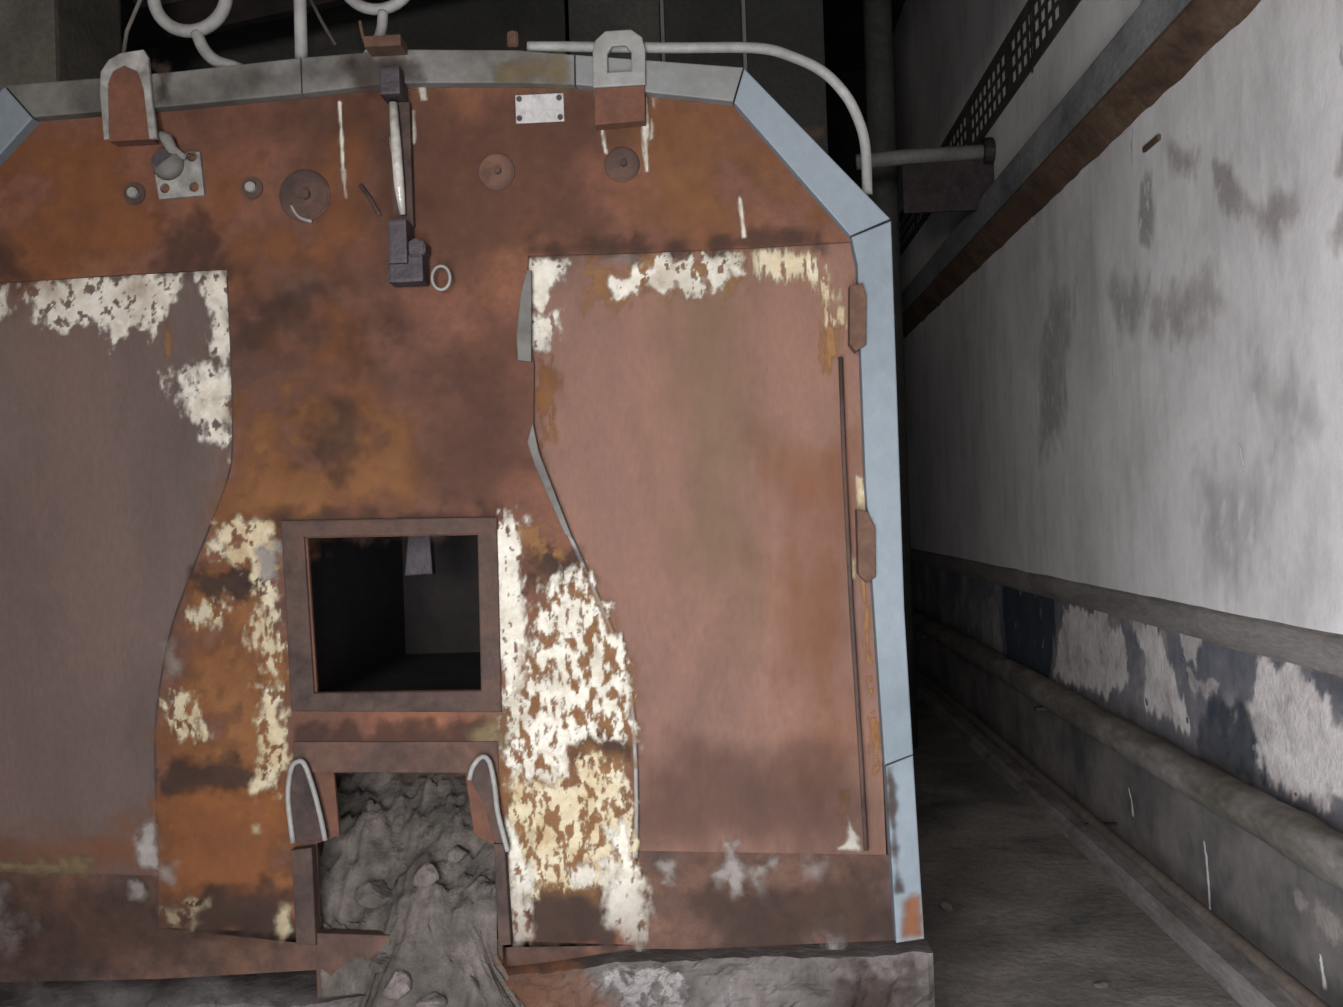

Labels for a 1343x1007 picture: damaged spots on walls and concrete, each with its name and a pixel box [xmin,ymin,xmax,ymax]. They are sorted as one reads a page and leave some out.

water stain [1140,179,1152,242]
water stain [1214,165,1239,210]
peeling [1053,604,1218,736]
peeling [1244,656,1343,813]